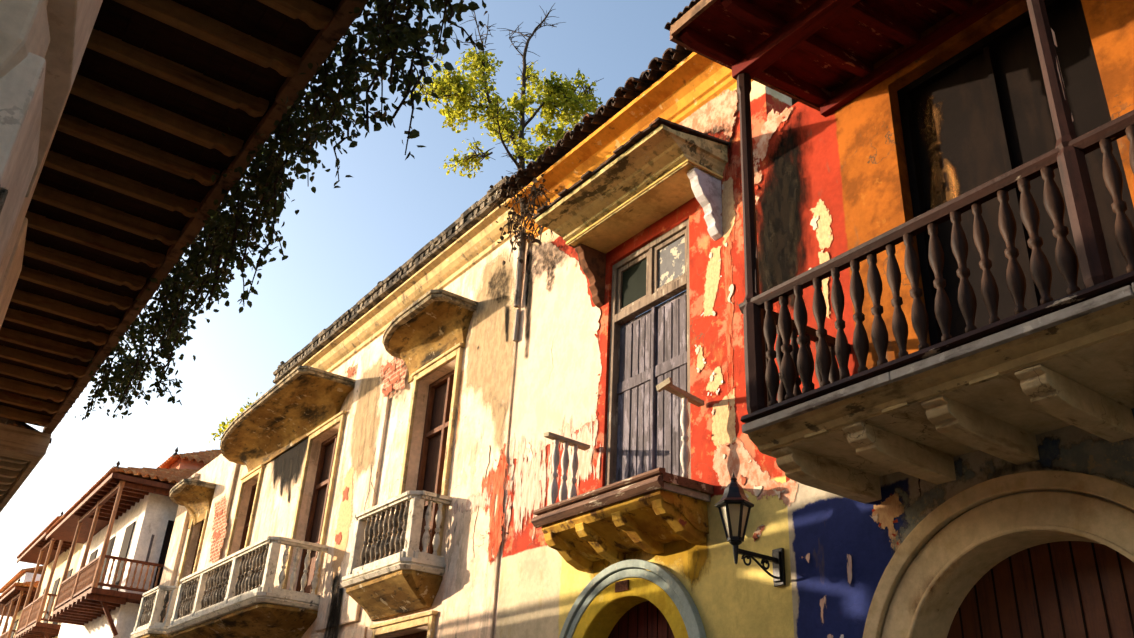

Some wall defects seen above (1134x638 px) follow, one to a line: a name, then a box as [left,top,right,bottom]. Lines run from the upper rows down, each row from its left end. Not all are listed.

water stain [755,114,807,294]
peeling [809,199,833,270]
spalling [380,357,407,398]
water stain [466,240,565,448]
peeling [454,242,603,565]
peeling [695,107,798,507]
peeling [822,277,831,318]
water stain [272,437,308,502]
peeling [871,493,904,552]
water stain [892,436,1134,553]